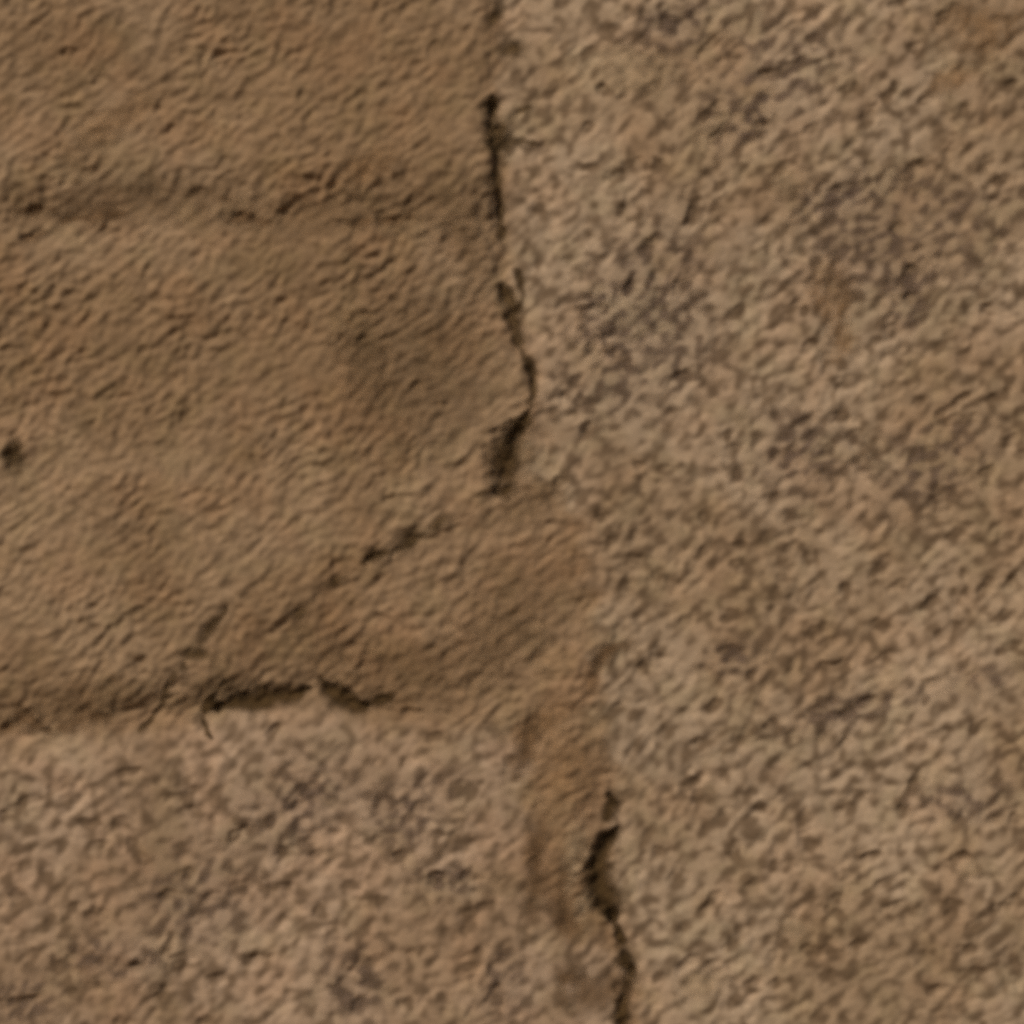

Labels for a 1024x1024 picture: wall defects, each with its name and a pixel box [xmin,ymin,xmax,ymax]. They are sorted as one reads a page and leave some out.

crack [489,9,500,25]
crack [503,42,521,54]
crack [483,95,535,240]
crack [500,269,536,433]
crack [360,515,446,564]
crack [329,577,340,586]
crack [201,678,395,739]
crack [585,792,635,1024]